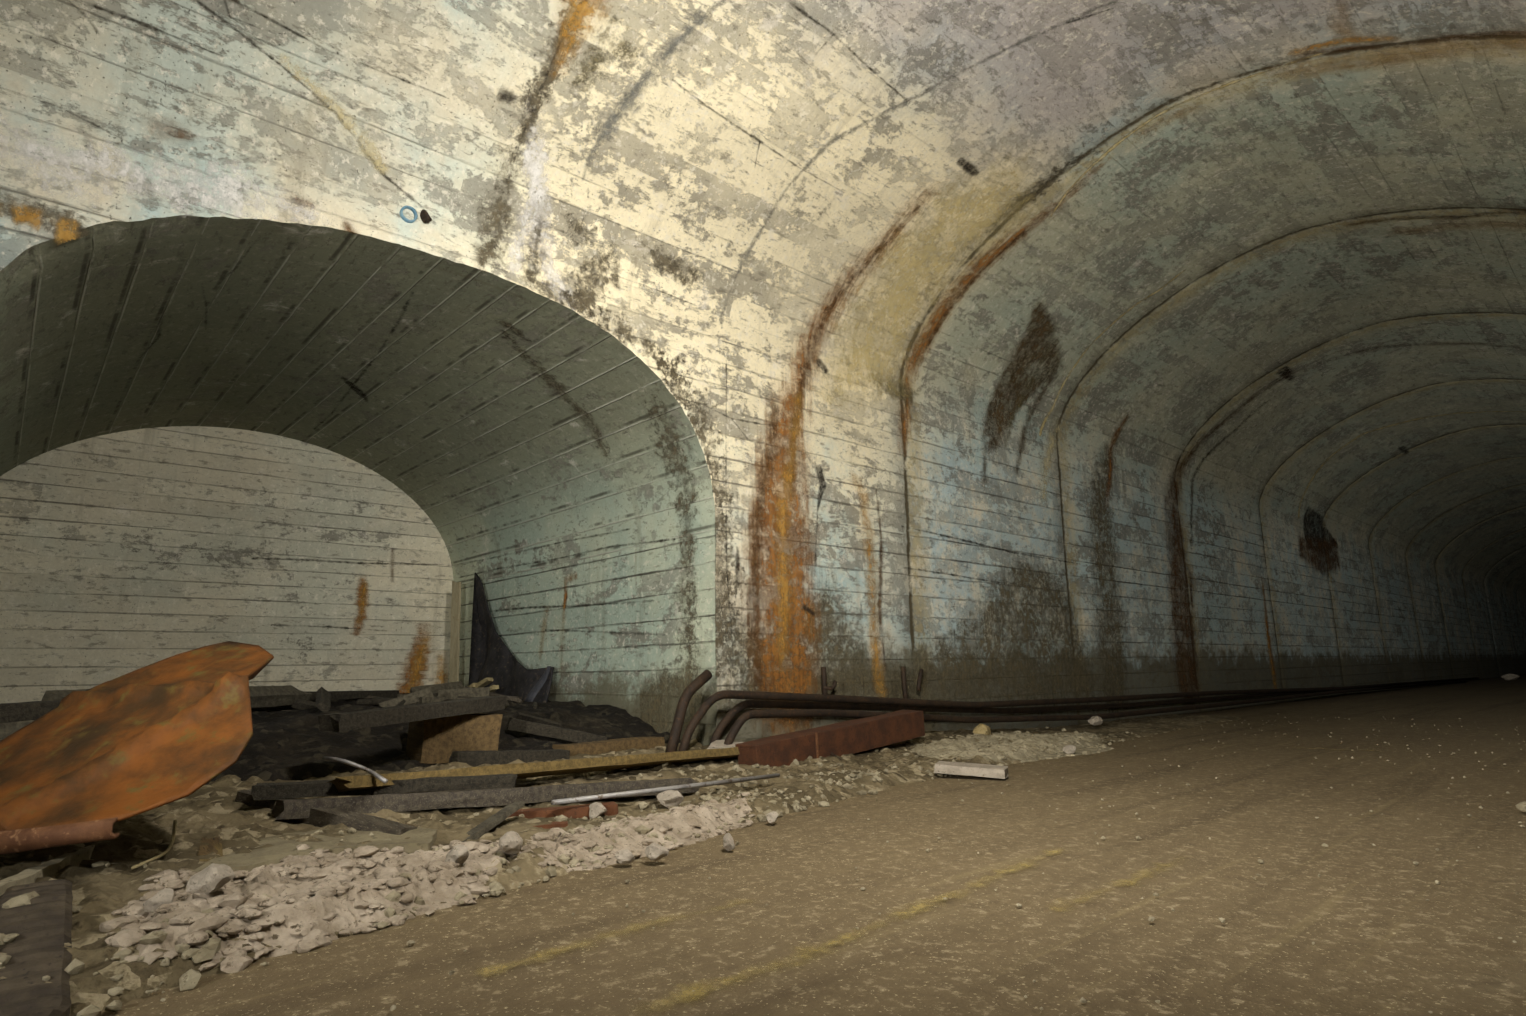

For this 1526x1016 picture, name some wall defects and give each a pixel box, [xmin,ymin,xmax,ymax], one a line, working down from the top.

peeling [0,130,277,220]
water stain [847,72,1264,404]
rust [354,579,367,635]
rust [397,628,447,694]
rust [747,207,918,732]
water stain [726,417,1127,720]
water stain [983,271,1184,498]
rust [1165,394,1258,705]
water stain [1299,537,1340,573]